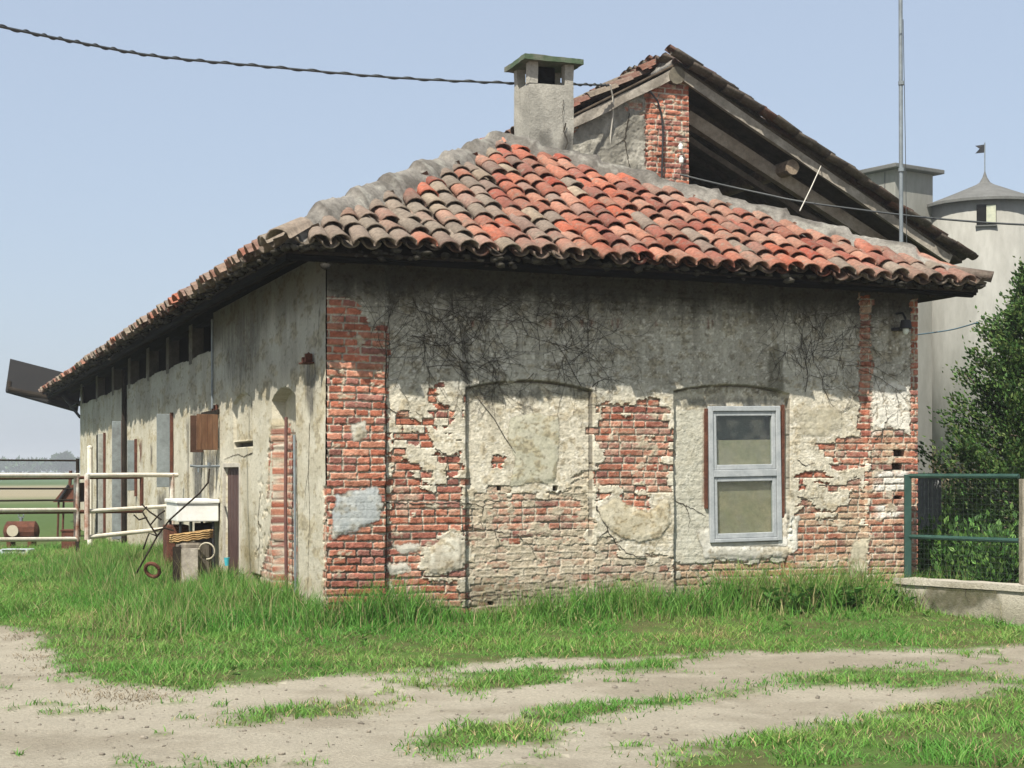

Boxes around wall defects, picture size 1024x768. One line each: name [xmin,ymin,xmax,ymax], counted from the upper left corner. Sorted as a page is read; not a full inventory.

flaking render [628,82,689,184]
flaking render [322,292,918,614]